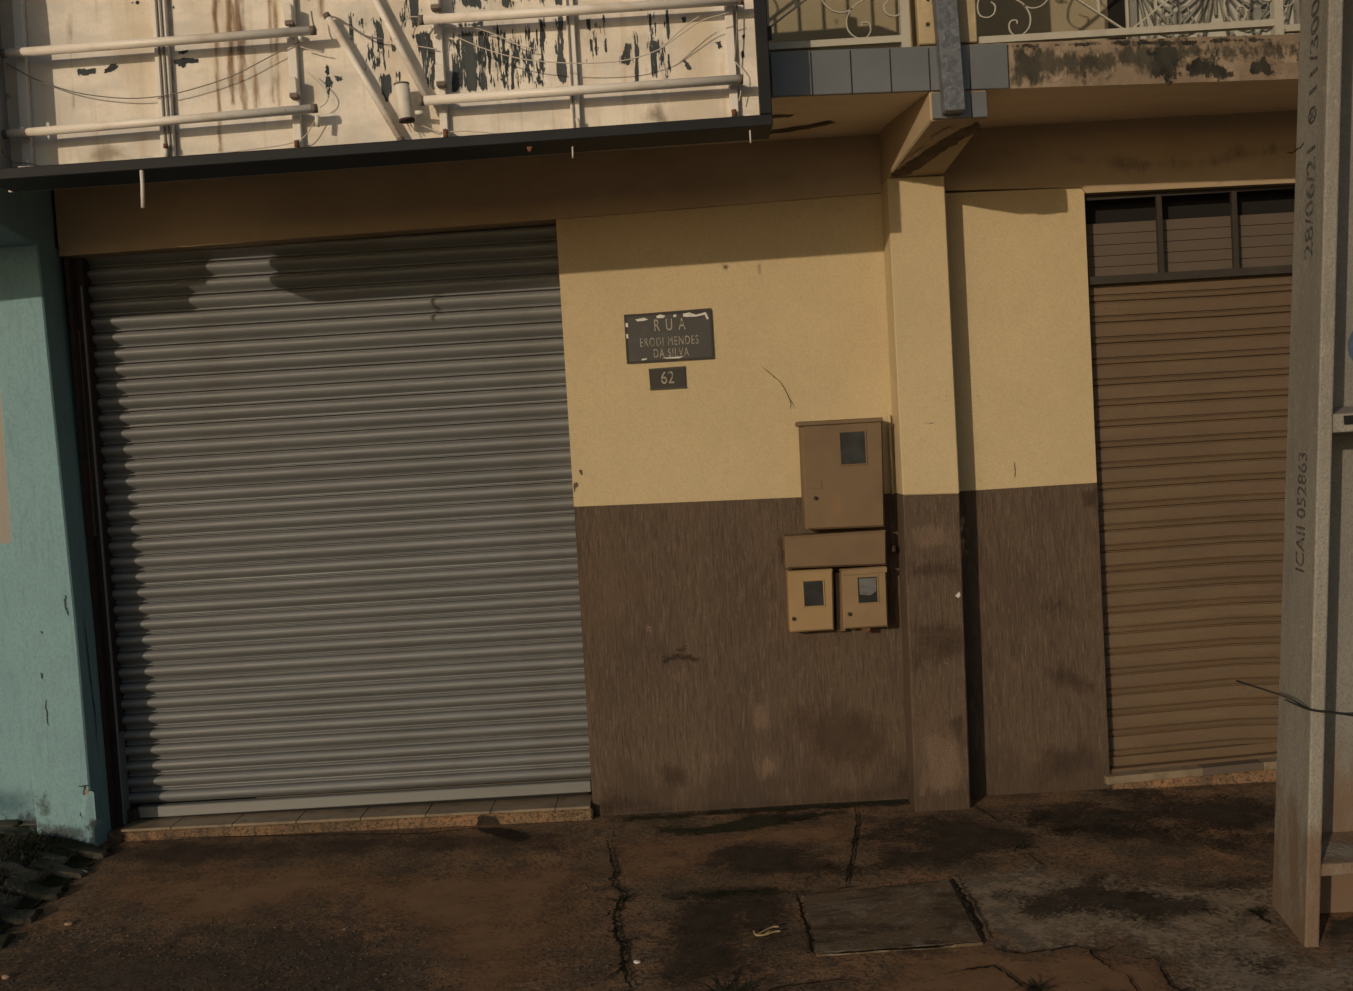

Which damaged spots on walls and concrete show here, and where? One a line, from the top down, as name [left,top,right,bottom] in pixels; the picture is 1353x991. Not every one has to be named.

water stain [1012,37,1300,86]
crack [838,806,859,889]